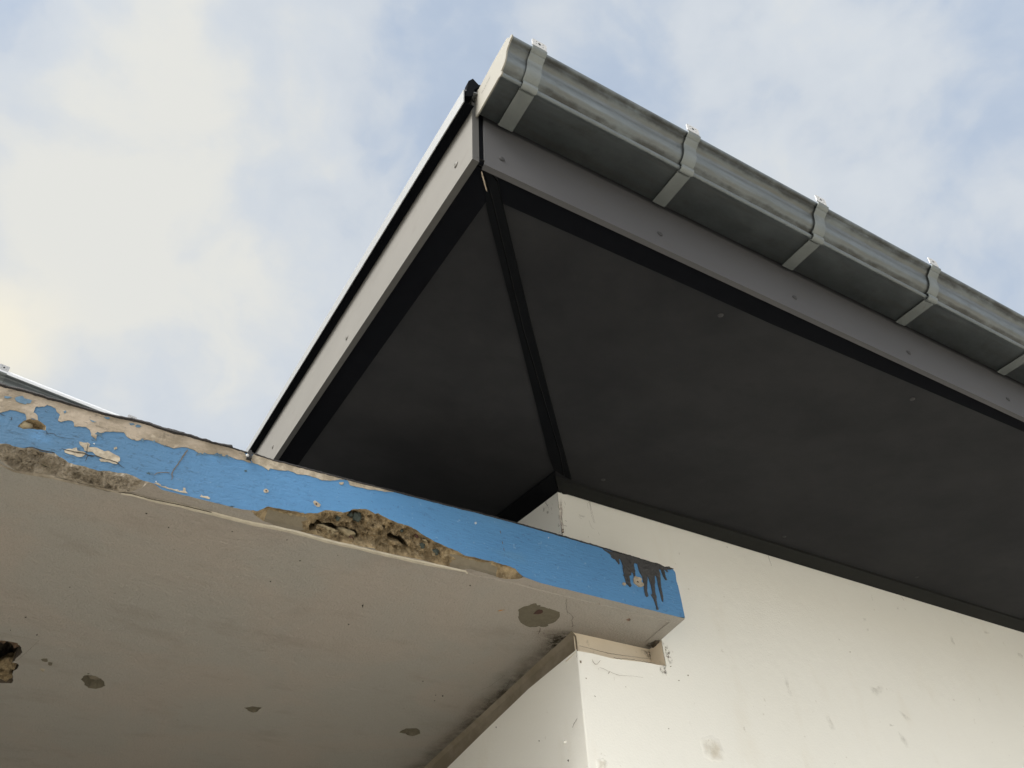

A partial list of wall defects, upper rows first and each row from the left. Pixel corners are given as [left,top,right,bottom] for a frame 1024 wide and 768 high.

peeling [0,386,392,493]
spalling [251,501,522,579]
peeling [518,603,560,627]
spalling [0,640,22,683]
spalling [81,673,105,689]